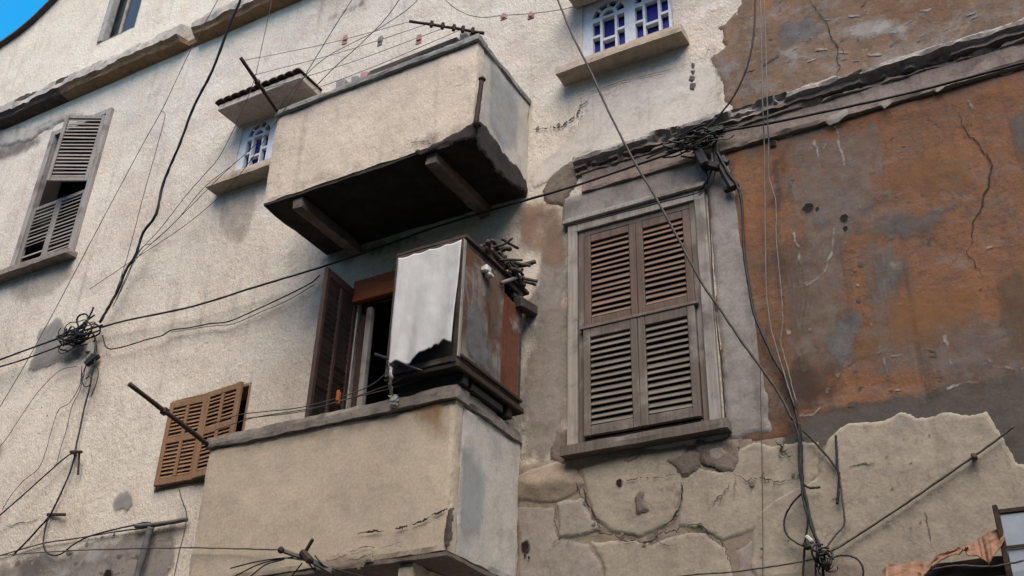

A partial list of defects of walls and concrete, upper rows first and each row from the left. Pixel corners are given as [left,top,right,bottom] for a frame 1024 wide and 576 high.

crack [529,47,709,131]
peeling [415,0,1024,207]
crack [809,0,845,76]
crack [958,112,993,275]
peeling [516,69,1024,576]
crack [326,509,448,561]
crack [548,441,799,565]